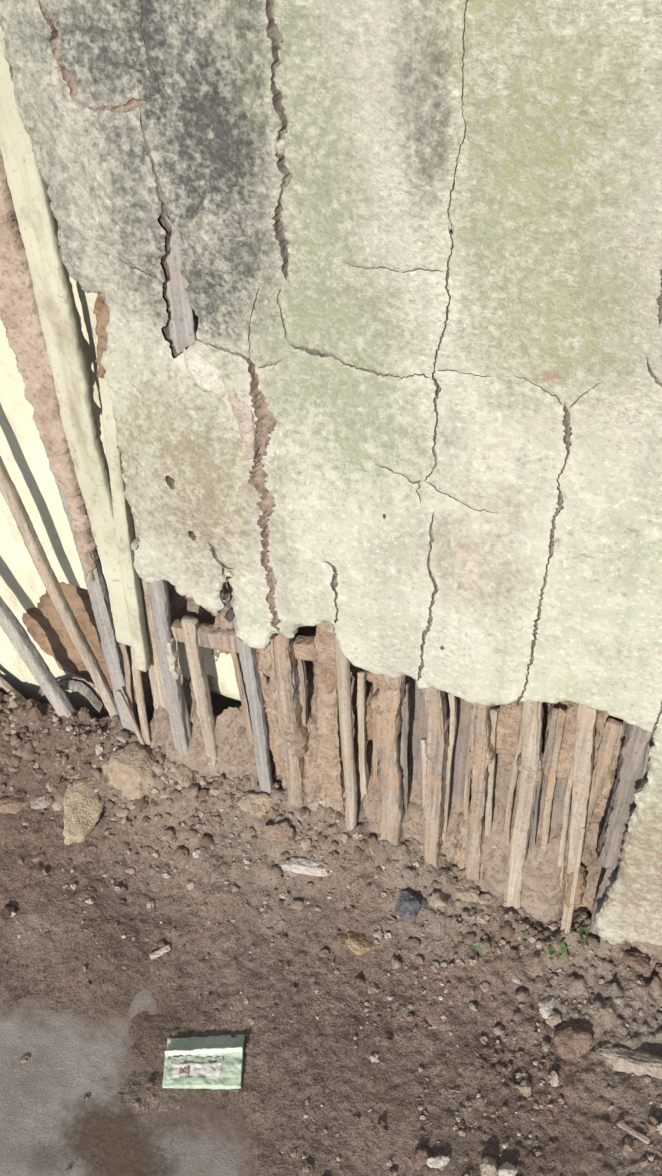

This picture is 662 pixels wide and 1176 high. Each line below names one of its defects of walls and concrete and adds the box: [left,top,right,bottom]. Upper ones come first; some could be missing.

crack [38,0,168,220]
spalling [93,293,110,378]
crack [117,257,156,278]
crack [195,0,600,706]
crack [647,360,662,387]
crack [654,269,662,328]
peeling [22,582,113,691]
flaking render [206,568,274,649]
peeling [133,669,154,722]
crack [652,700,662,733]
flaking render [594,727,655,927]